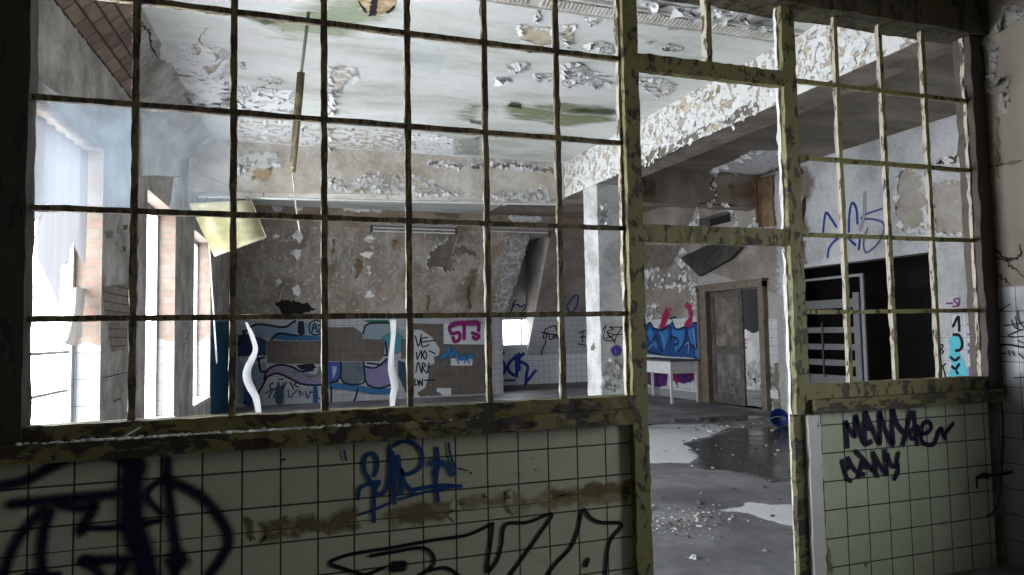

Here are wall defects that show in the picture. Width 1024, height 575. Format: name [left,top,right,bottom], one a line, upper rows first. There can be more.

crack [141,22,159,58]
peeling [493,10,614,90]
peeling [795,31,876,86]
peeling [981,4,1024,115]
peeling [158,42,618,219]
mould [507,103,615,126]
peeling [639,77,759,167]
peeling [710,150,779,176]
peeling [892,148,963,237]
flaking render [425,237,478,274]
peeling [643,244,697,320]